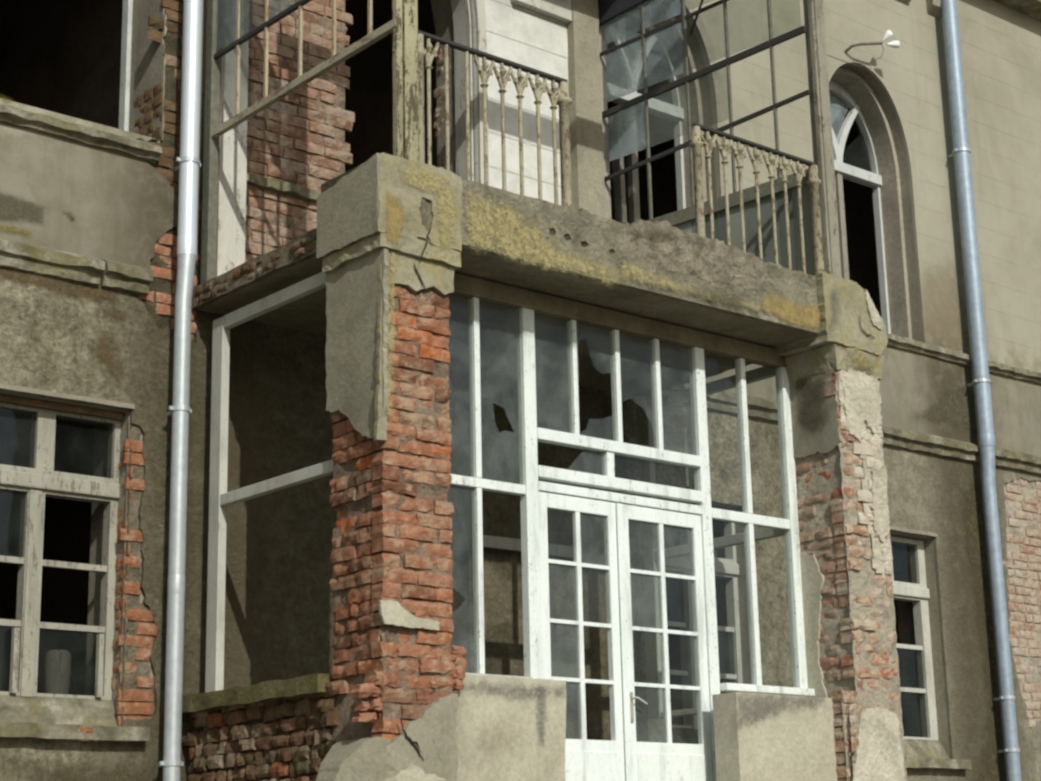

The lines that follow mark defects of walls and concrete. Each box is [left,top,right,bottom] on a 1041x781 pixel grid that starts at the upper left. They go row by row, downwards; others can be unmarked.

flaking render [134,0,184,197]
water stain [0,194,43,235]
flaking render [134,227,178,331]
crack [414,227,433,290]
water stain [403,169,820,328]
flaking render [111,416,157,727]
flaking render [182,198,467,781]
flaking render [789,367,907,781]
flaking render [1003,478,1041,728]